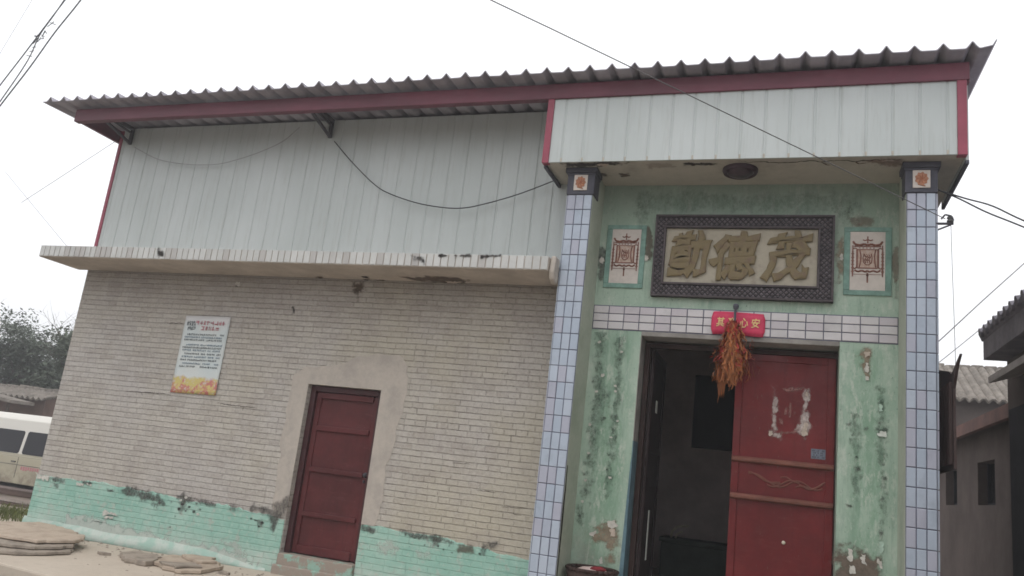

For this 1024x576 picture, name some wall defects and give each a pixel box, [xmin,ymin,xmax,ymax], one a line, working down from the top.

peeling [860,348,872,380]
damp [587,332,623,496]
spalling [589,520,618,564]
spalling [832,542,884,576]